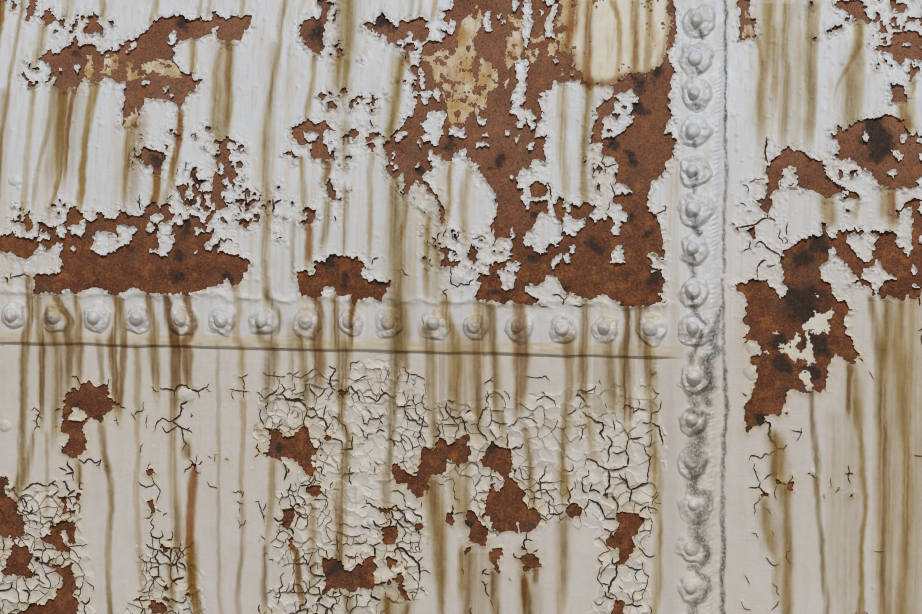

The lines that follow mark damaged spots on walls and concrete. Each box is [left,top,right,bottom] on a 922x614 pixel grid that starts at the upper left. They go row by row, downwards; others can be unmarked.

peeling [1,0,252,175]
peeling [0,136,271,296]
peeling [283,0,677,307]
peeling [735,114,922,433]
peeling [827,0,922,103]
peeling [11,493,81,614]
crack [0,458,107,614]
peeling [61,380,116,458]
peeling [254,426,322,497]
peeling [317,555,410,601]
crack [108,361,663,614]
peeling [391,434,542,574]